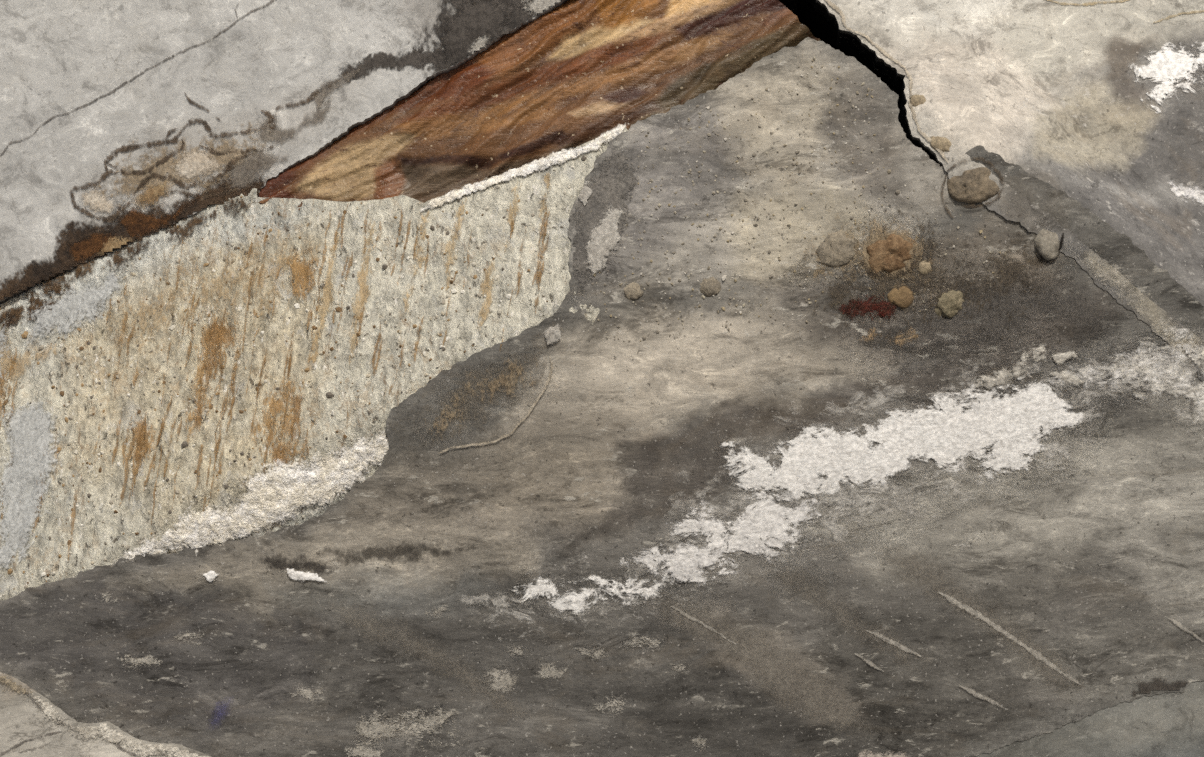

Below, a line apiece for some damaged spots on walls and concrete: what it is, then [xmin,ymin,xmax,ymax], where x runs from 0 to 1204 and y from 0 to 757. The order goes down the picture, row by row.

crack [1,0,274,155]
crack [797,0,902,110]
damp [1131,41,1204,113]
rust [0,175,264,426]
rust [106,205,382,524]
spalling [0,127,638,600]
rust [391,209,429,311]
rust [500,174,550,349]
damp [814,224,1110,345]
damp [1169,182,1204,204]
damp [462,327,1204,621]
damp [345,706,459,757]